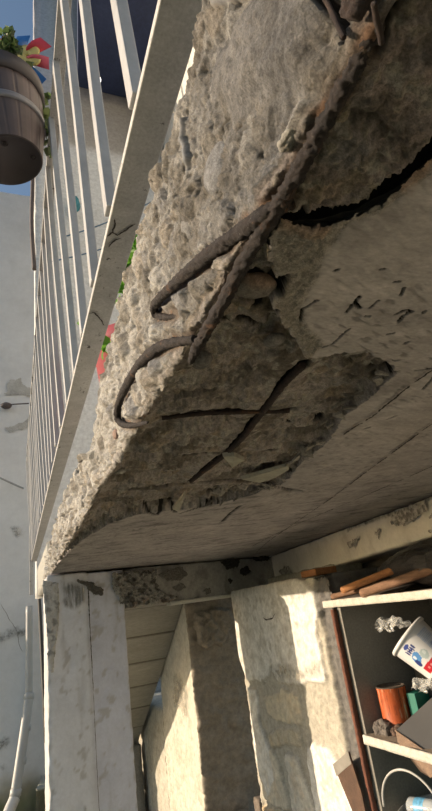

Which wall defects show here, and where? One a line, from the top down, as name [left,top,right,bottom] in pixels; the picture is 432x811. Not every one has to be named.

rust [221,0,389,236]
crack [281,136,432,225]
peeling [4,378,31,396]
rust [150,237,249,361]
spalling [42,0,432,673]
crack [125,328,352,523]
crack [253,424,432,552]
crack [344,361,432,435]